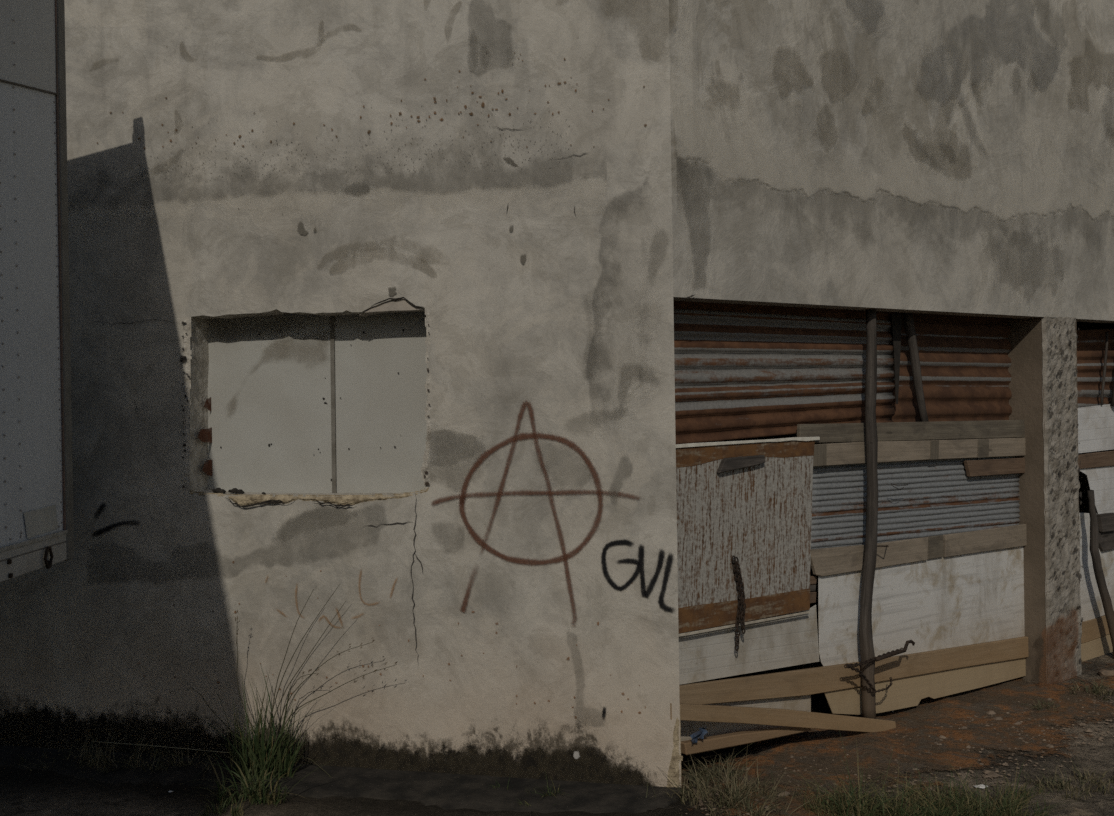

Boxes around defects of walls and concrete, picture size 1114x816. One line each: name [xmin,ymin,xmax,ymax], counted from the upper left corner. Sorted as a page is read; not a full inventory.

spalling [180,287,431,505]
crack [225,495,423,668]
water stain [0,693,655,786]